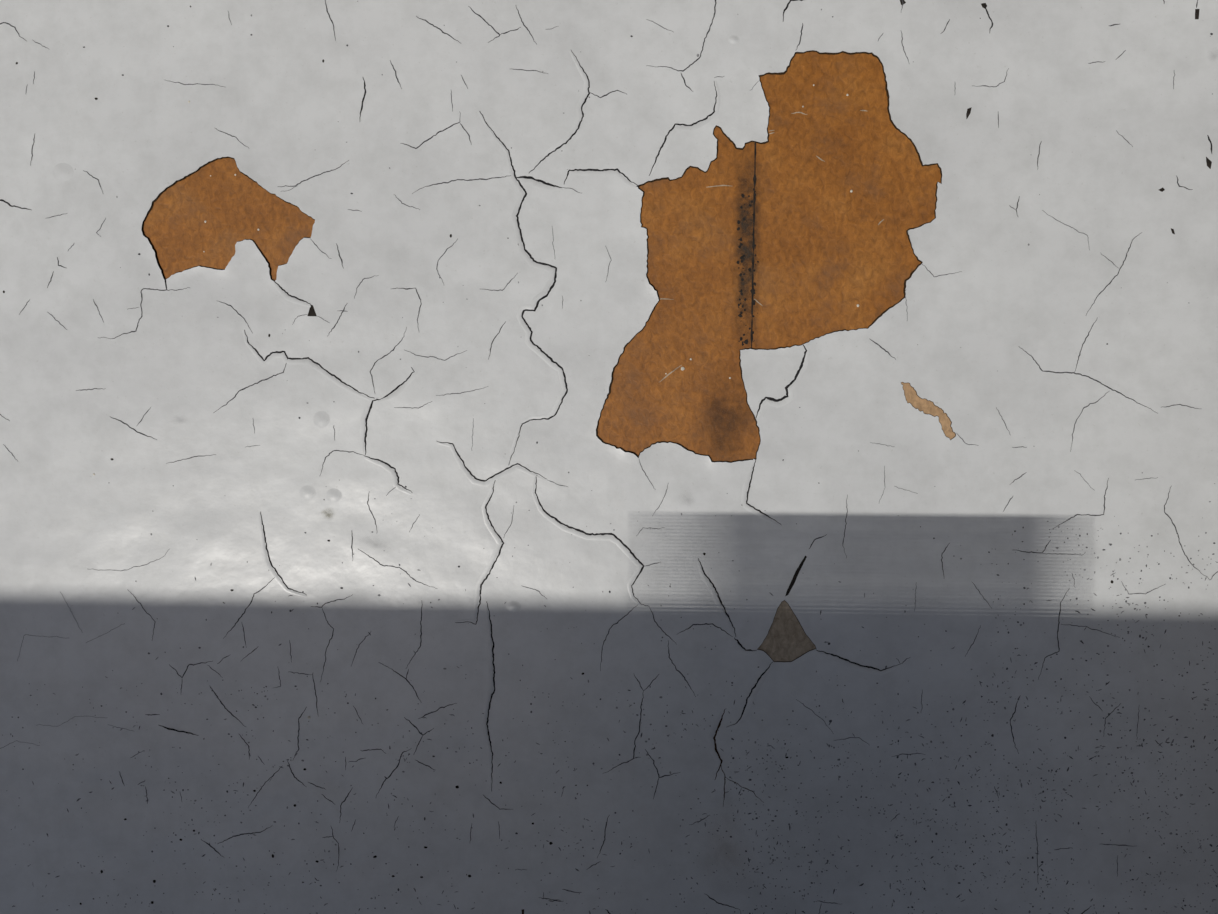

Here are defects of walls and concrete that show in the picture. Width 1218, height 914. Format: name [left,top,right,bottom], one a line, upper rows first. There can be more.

crack [783,0,803,50]
crack [0,199,67,219]
crack [20,170,106,330]
crack [93,279,189,339]
peeling [138,157,315,281]
peeling [596,51,942,463]
crack [111,407,215,464]
crack [172,0,781,869]
crack [756,344,810,419]
peeling [901,382,956,440]
crack [1009,196,1218,754]
peeling [758,556,816,662]